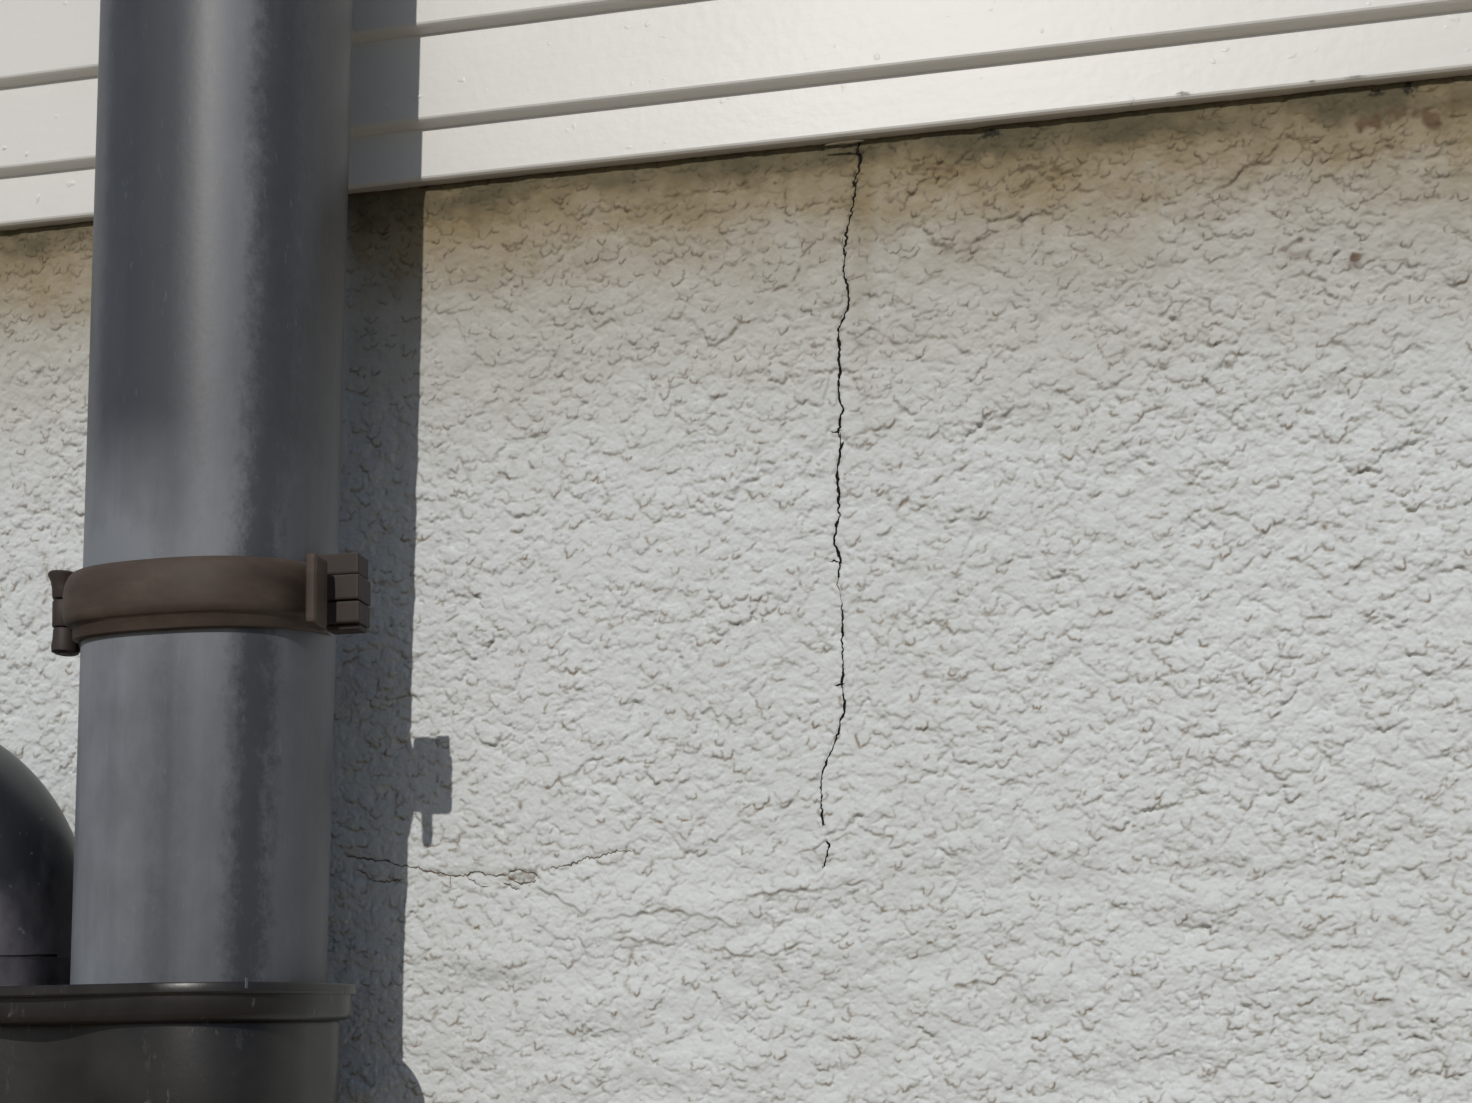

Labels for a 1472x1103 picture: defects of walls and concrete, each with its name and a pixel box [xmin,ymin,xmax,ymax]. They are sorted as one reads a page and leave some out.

crack [820,142,863,868]
damp [348,75,1472,285]